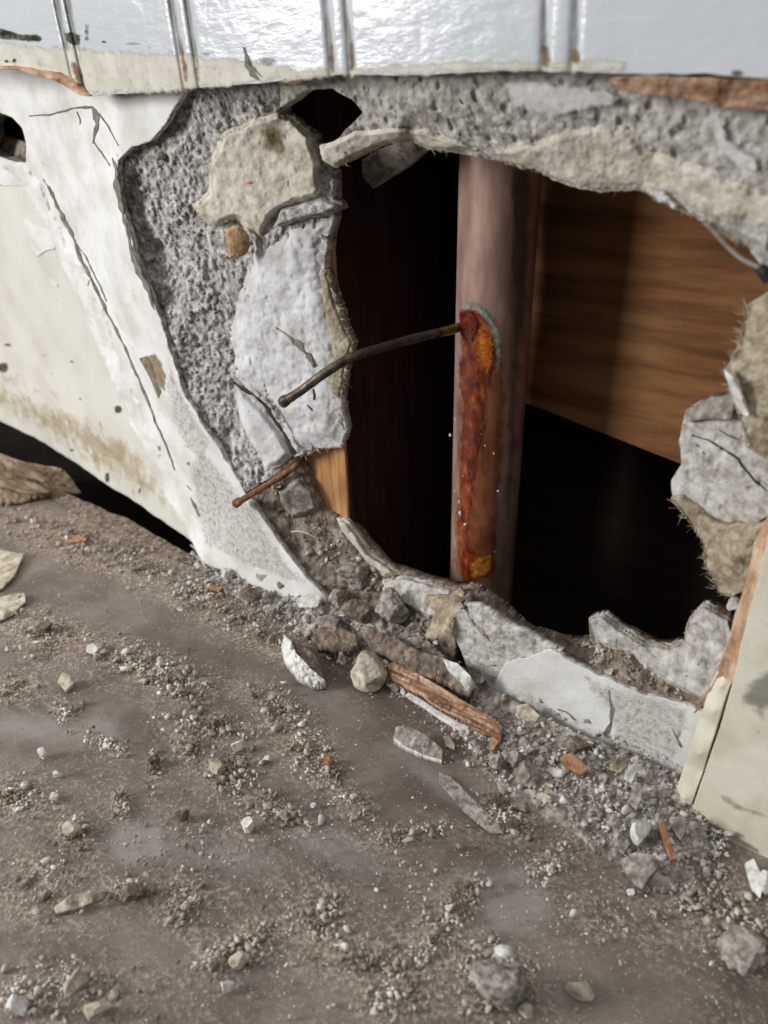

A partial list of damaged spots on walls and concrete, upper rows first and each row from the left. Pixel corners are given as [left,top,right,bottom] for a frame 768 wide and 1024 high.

rust [72,63,83,87]
crack [29,106,155,310]
crack [42,179,200,517]
spalling [0,42,768,811]
rust [455,309,506,581]
crack [691,429,767,492]